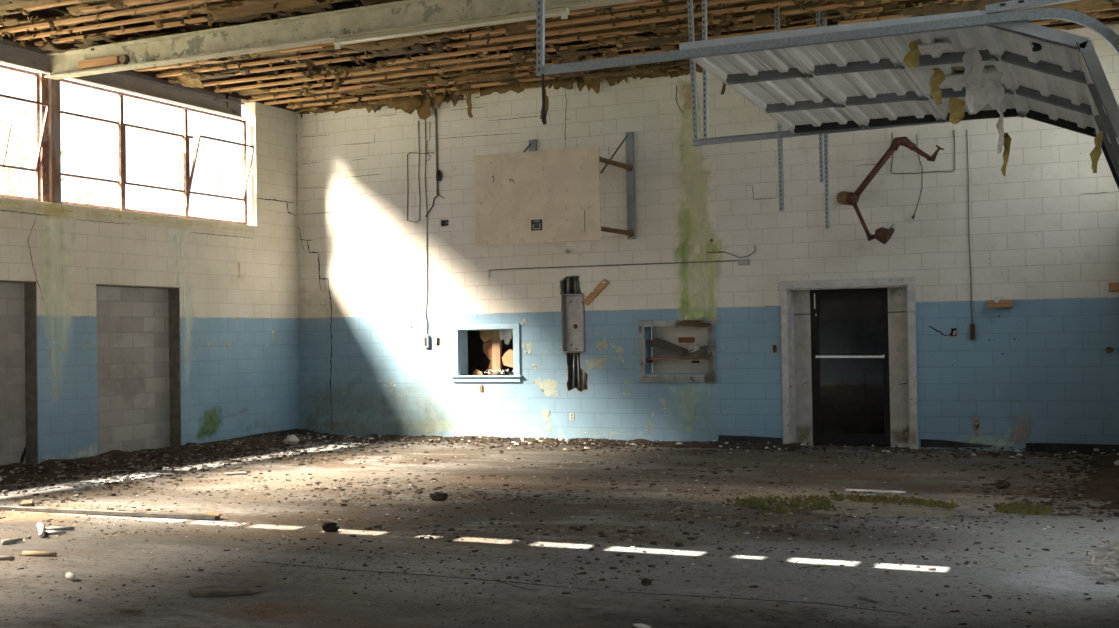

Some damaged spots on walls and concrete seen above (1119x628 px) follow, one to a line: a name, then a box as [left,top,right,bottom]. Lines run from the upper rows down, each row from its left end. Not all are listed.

peeling [122,31,228,67]
crack [257,114,396,428]
spalling [559,275,585,312]
spalling [521,327,625,431]